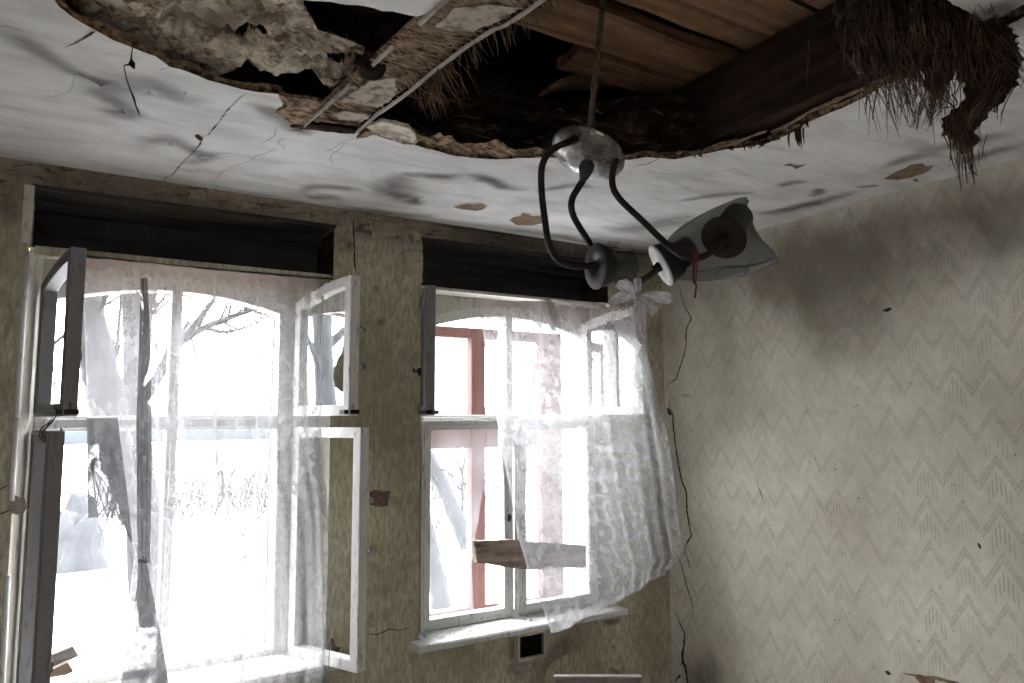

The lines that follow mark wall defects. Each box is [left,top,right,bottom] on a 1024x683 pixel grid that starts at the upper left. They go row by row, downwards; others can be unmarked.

spalling [998,5,1024,26]
spalling [55,0,557,159]
spalling [624,74,907,160]
crack [161,92,285,183]
peeling [881,162,936,182]
peeling [451,203,489,211]
peeling [508,212,549,226]
crack [666,283,693,683]
peeling [368,488,392,509]